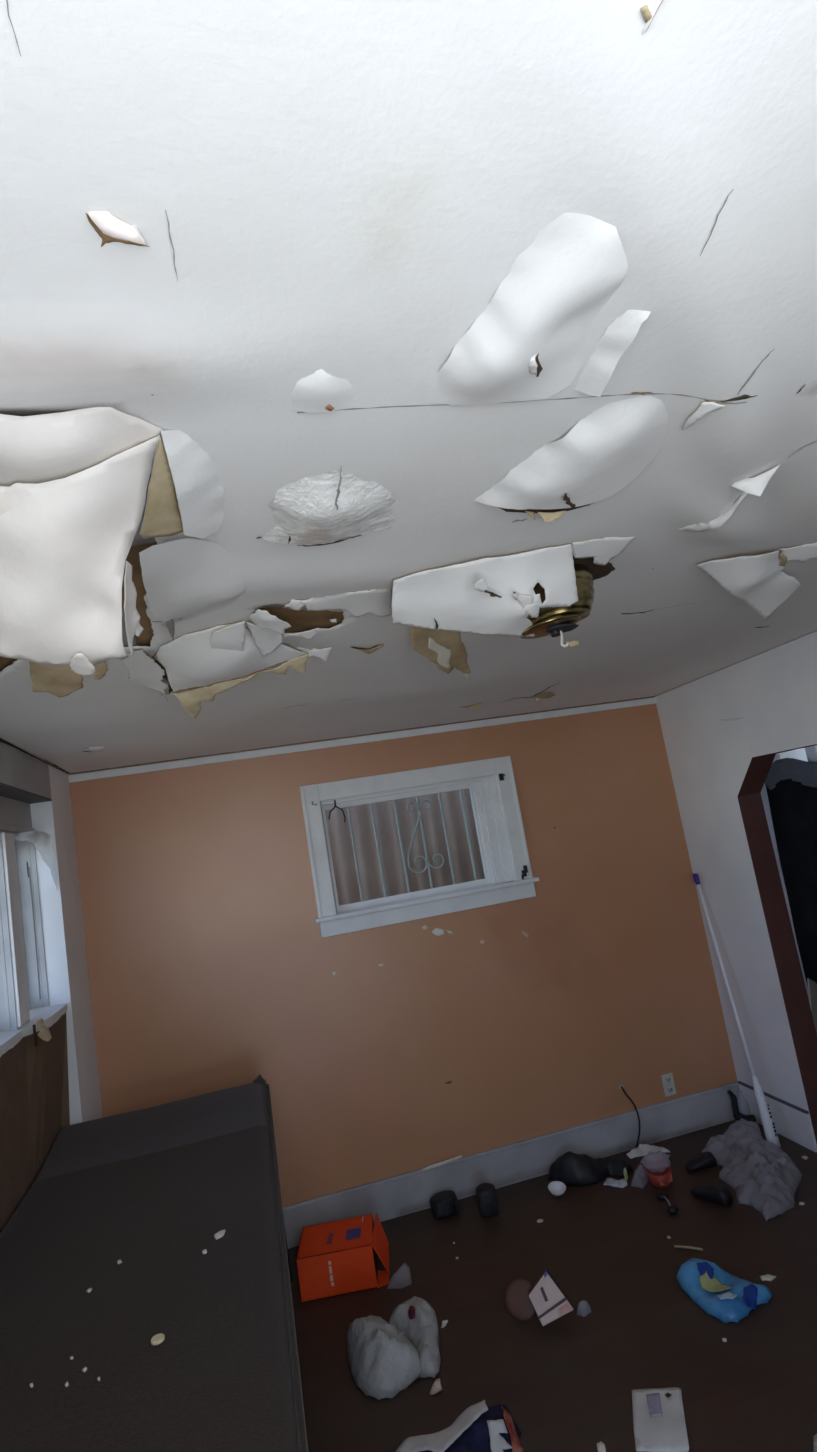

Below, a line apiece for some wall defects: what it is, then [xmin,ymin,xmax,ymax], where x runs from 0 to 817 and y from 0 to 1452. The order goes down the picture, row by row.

crack [6,0,21,56]
peeling [87,211,148,245]
peeling [572,537,635,580]
peeling [779,543,817,566]
peeling [283,589,392,618]
peeling [70,653,95,677]
peeling [124,649,168,701]